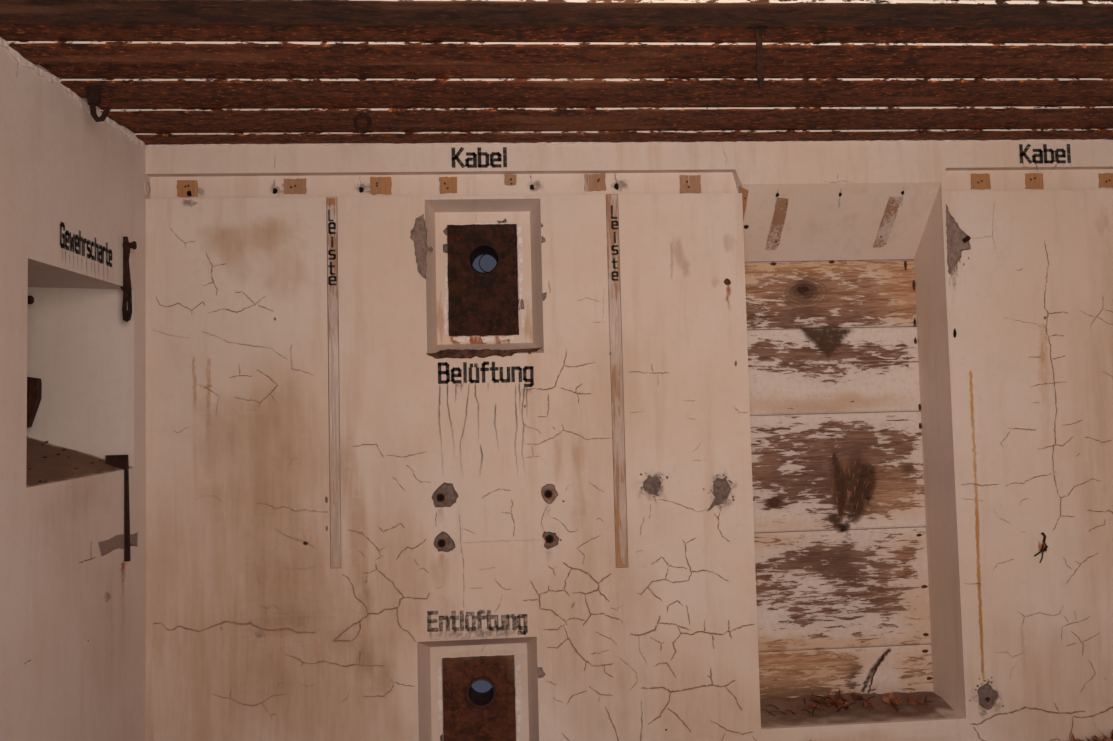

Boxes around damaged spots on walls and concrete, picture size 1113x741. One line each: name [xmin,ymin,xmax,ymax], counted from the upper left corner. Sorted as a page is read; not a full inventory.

crack [156,254,267,313]
flaking render [410,214,541,359]
flaking render [946,205,971,279]
crack [231,346,310,403]
crack [527,355,605,458]
crack [962,244,1113,582]
rust [970,372,984,670]
crack [154,523,429,699]
crack [497,500,757,741]
crack [972,611,1113,741]